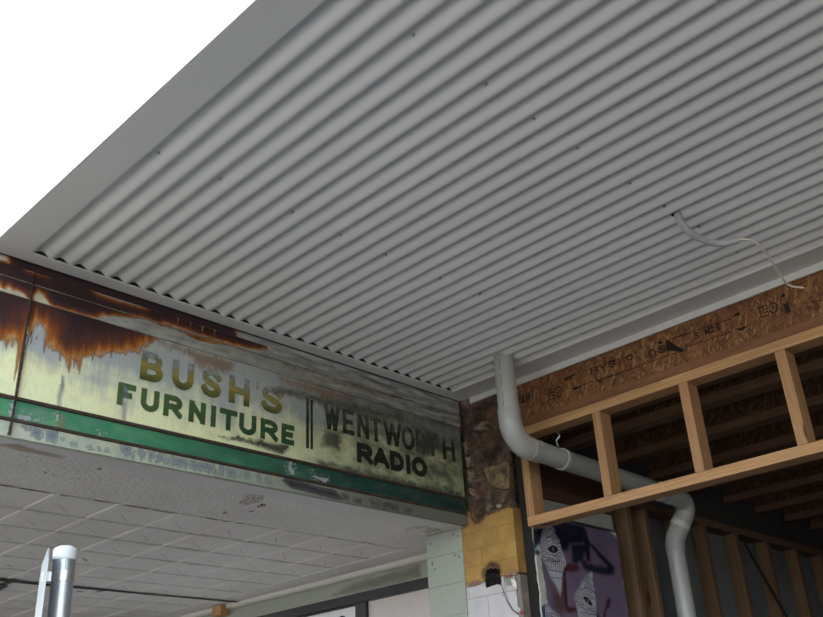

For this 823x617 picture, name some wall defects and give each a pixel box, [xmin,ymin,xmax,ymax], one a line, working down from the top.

corrosion [0,255,268,380]
peeling [3,400,62,426]